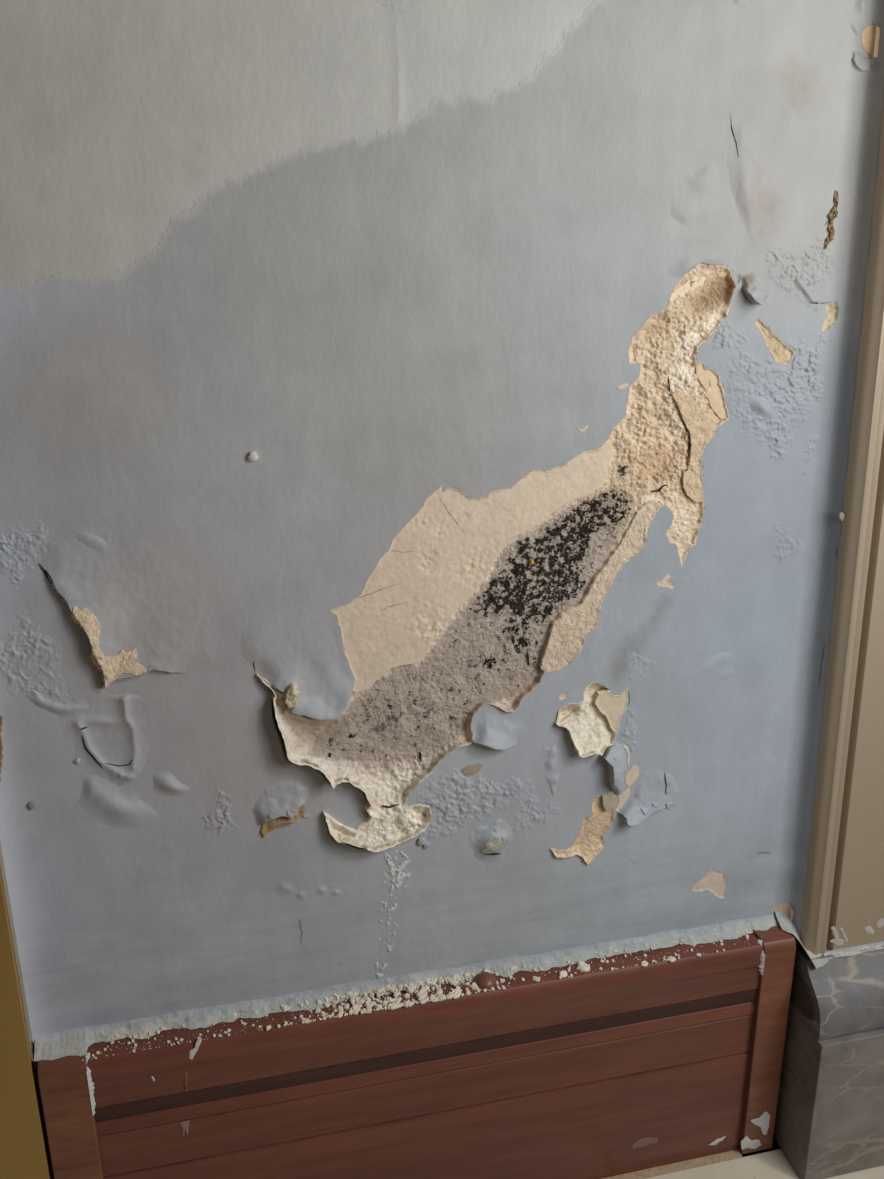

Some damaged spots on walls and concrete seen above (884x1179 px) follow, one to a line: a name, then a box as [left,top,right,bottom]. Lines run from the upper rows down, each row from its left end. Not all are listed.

peeling [852,25,880,72]
spalling [823,190,839,250]
peeling [755,320,793,365]
peeling [39,522,219,688]
damp [309,484,636,762]
spalling [241,263,770,865]
damp [601,591,676,692]
damp [374,849,411,980]
peeling [691,868,727,899]